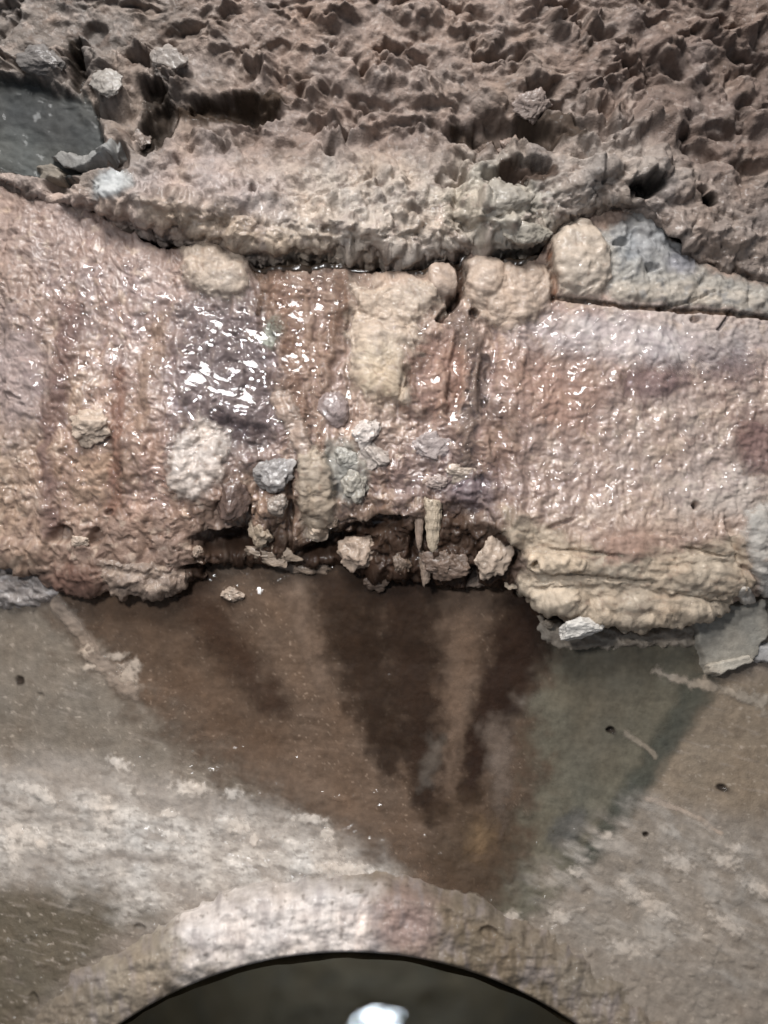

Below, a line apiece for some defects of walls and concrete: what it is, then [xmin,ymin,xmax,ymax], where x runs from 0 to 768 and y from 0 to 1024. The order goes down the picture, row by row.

spalling [0,37,132,198]
damp [0,324,52,424]
damp [182,301,286,446]
damp [539,316,744,364]
damp [322,443,365,498]
peeling [503,502,768,677]
damp [0,462,768,955]